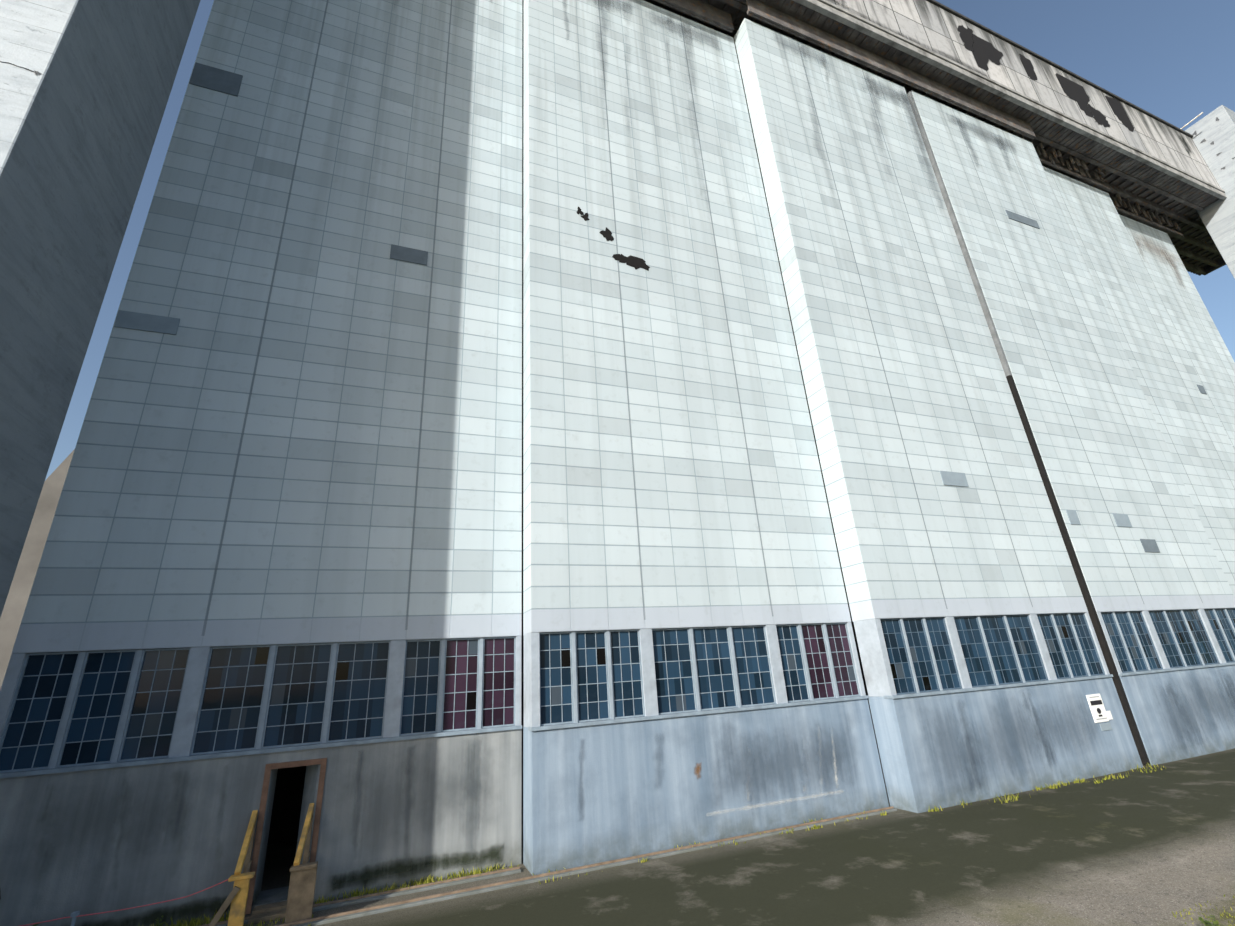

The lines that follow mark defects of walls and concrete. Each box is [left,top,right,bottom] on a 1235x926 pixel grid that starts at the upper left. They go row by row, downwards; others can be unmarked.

peeling [958,25,1003,71]
peeling [1019,54,1037,80]
peeling [1056,73,1134,132]